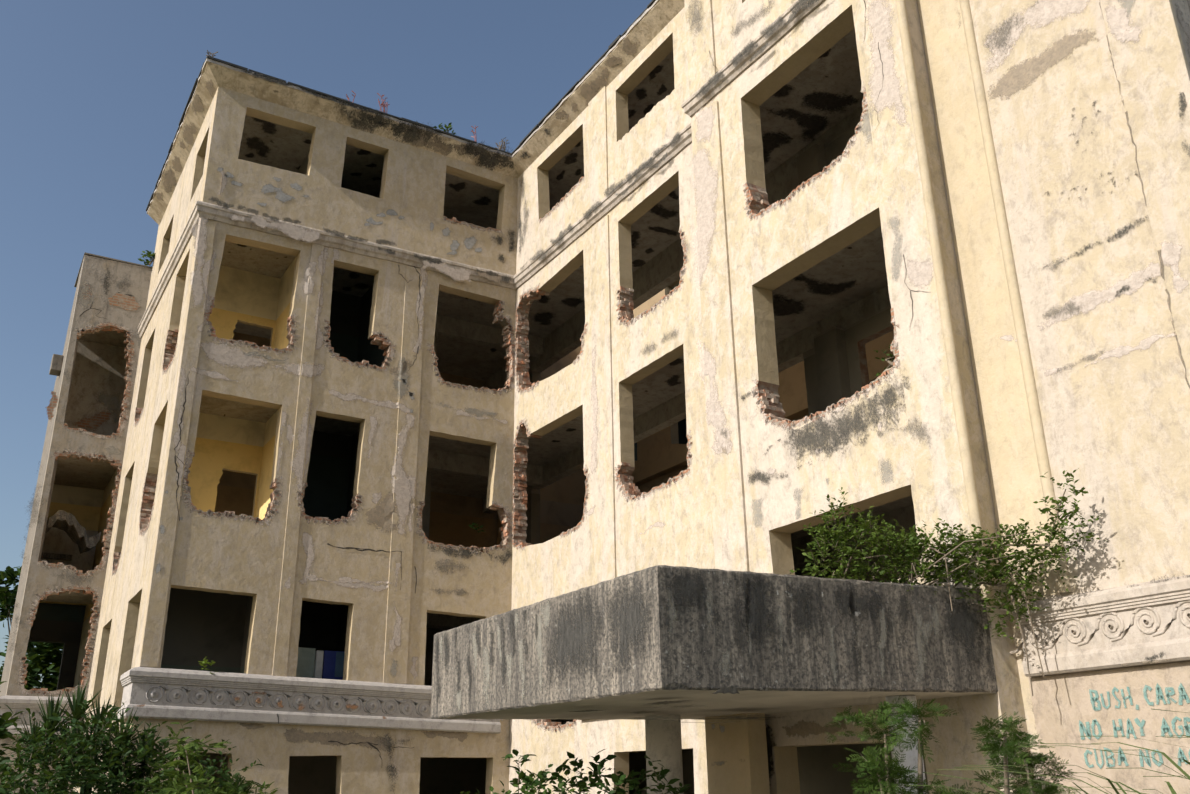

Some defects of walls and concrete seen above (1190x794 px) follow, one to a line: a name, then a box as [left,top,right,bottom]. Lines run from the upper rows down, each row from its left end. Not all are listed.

peeling [985,0,1142,100]
flaking render [245,117,276,158]
water stain [583,133,682,218]
crack [1099,0,1147,205]
peeling [1038,241,1189,331]
crack [1157,249,1190,389]
crack [174,371,190,521]
peeling [139,166,582,592]
water stain [747,471,788,483]
water stain [767,378,929,461]
crack [327,543,417,593]
water stain [435,571,720,711]